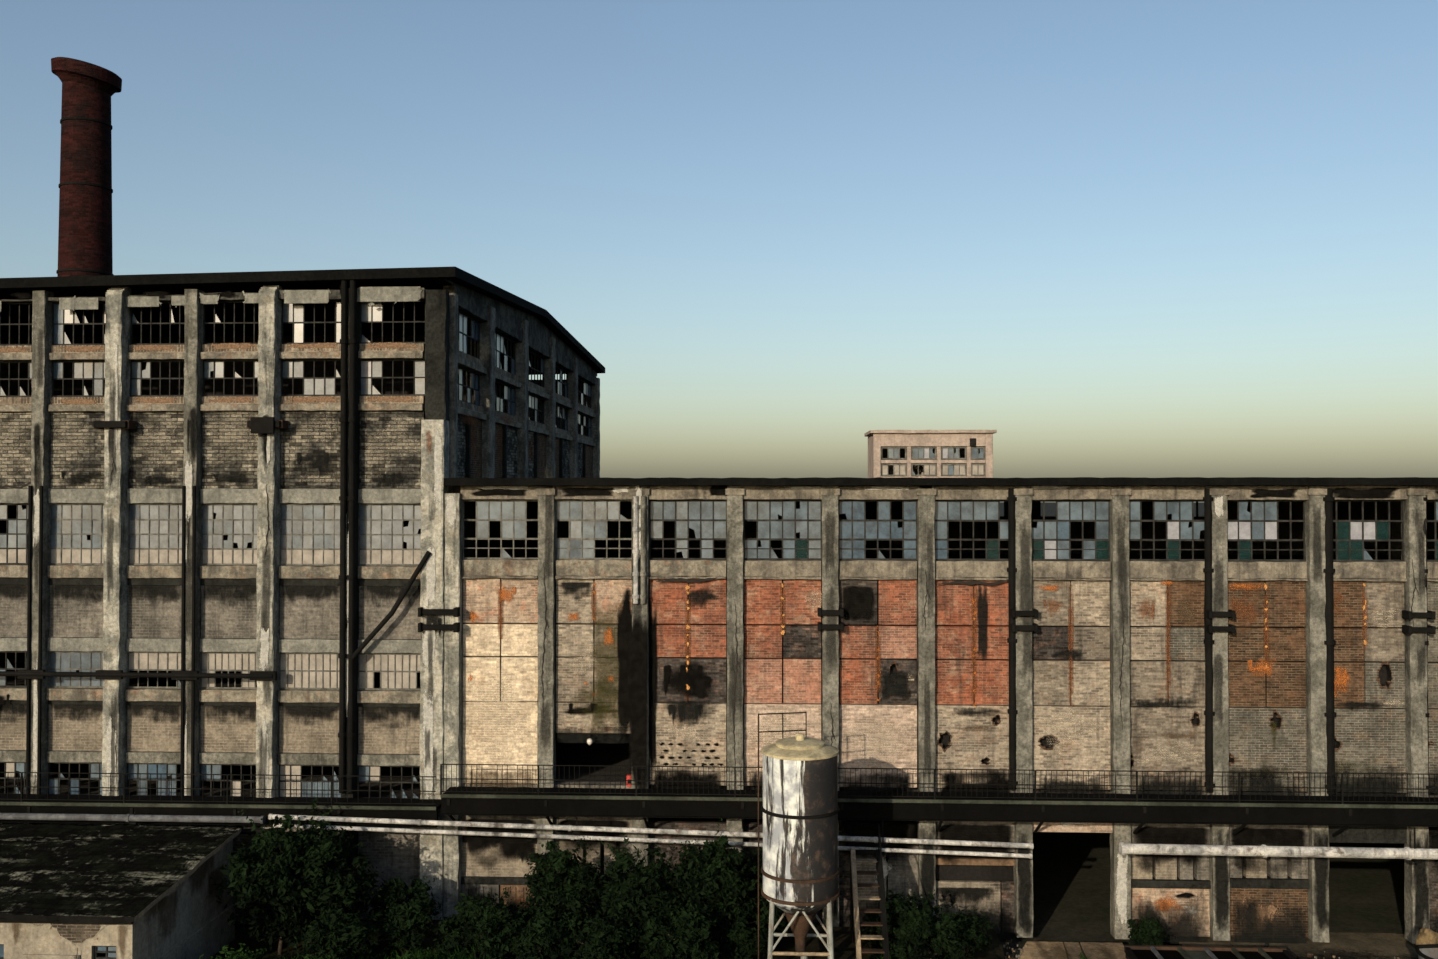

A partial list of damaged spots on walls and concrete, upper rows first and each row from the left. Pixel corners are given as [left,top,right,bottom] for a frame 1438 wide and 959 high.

rust [500,587,516,601]
damp [688,589,715,606]
rust [1231,583,1271,674]
rust [1334,668,1349,694]
spalling [1376,661,1393,691]
damp [652,665,702,736]
spalling [937,731,952,753]